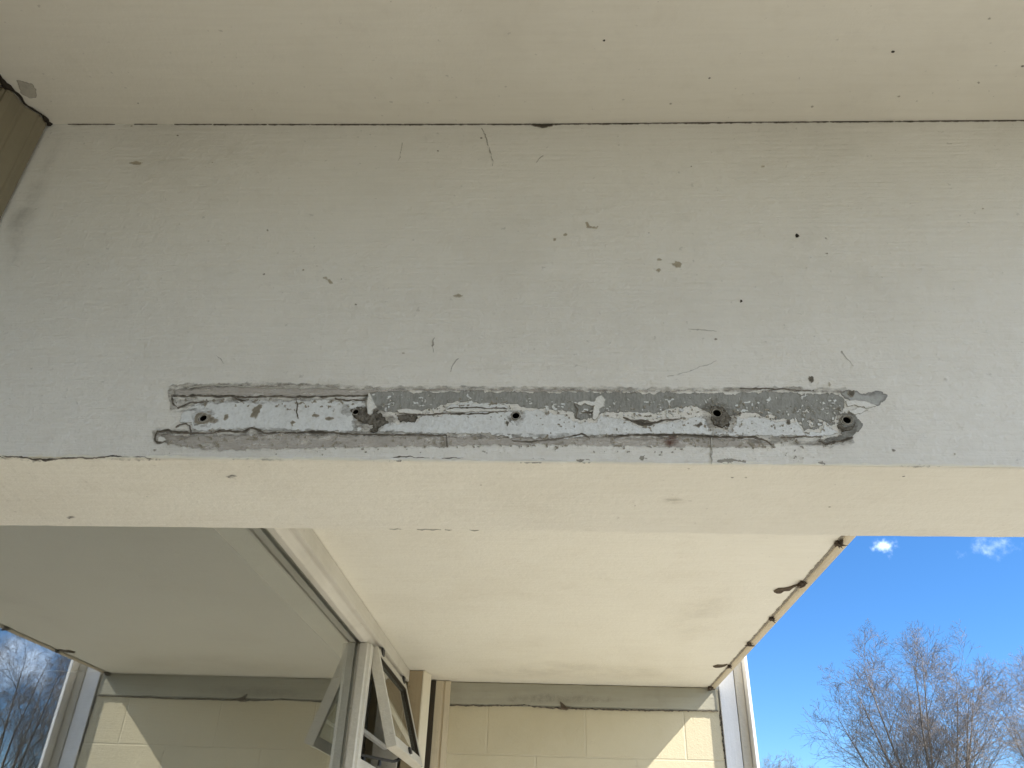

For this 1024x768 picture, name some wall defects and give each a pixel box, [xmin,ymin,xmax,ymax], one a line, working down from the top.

peeling [153,376,887,463]